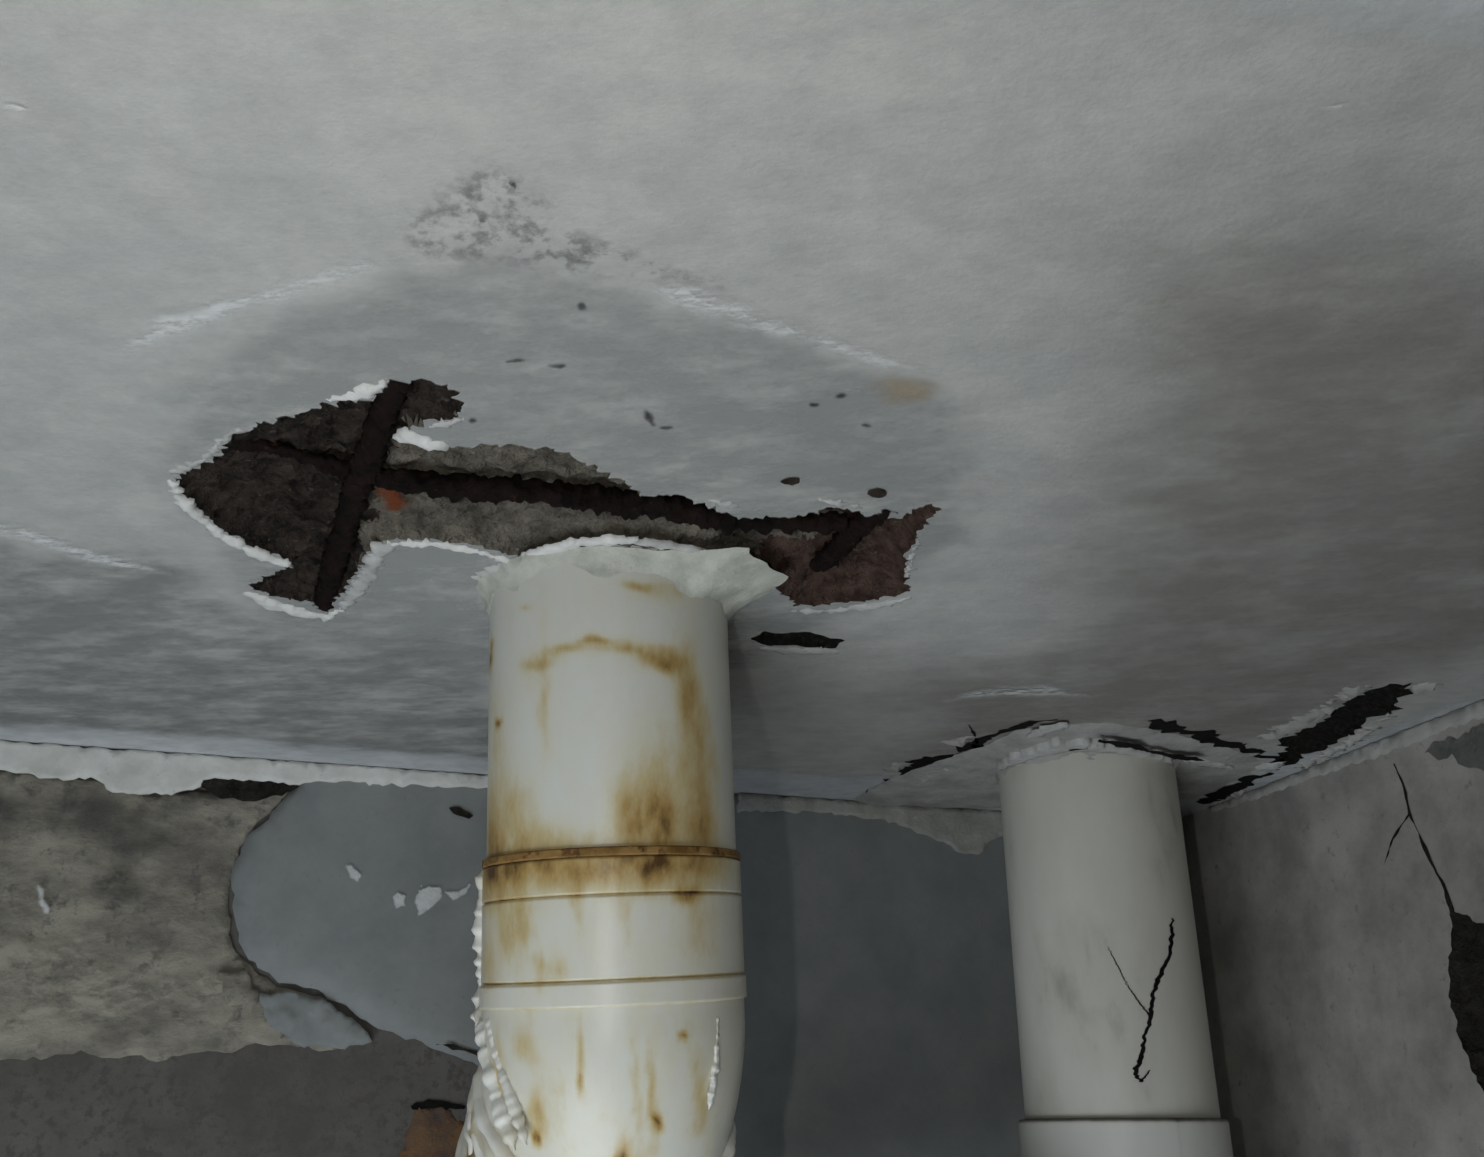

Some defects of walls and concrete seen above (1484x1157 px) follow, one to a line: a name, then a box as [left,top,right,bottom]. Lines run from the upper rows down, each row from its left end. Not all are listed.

damp [0,0,1484,776]
corrosion [377,488,406,510]
spalling [167,378,942,655]
crack [866,719,1058,799]
crack [1098,682,1443,810]
peeling [1209,700,1484,811]
flaking render [0,740,488,1062]
crack [1384,764,1455,913]
flaking render [1448,912,1484,1091]